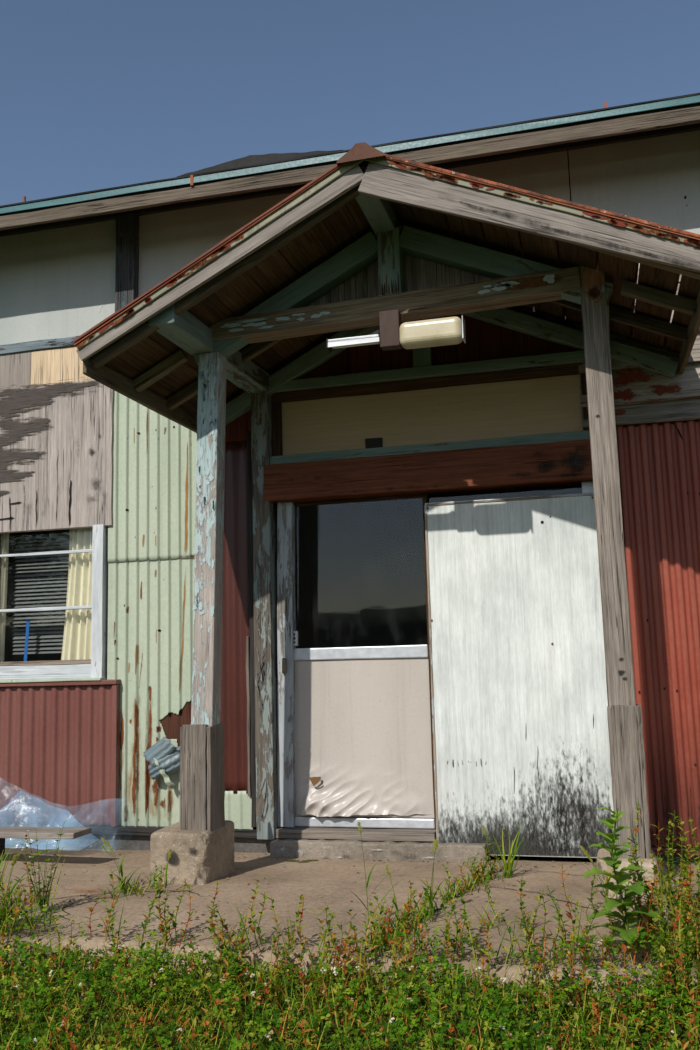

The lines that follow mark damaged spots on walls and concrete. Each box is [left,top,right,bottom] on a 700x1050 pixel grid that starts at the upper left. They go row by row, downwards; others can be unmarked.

rust [387,162,552,205]
rust [166,232,244,287]
rust [582,211,700,247]
rust [77,308,134,348]
peeling [612,365,700,415]
peeling [196,446,215,526]
peeling [192,541,214,629]
peeling [256,580,269,714]
rust [116,645,172,821]
water stain [439,750,615,857]